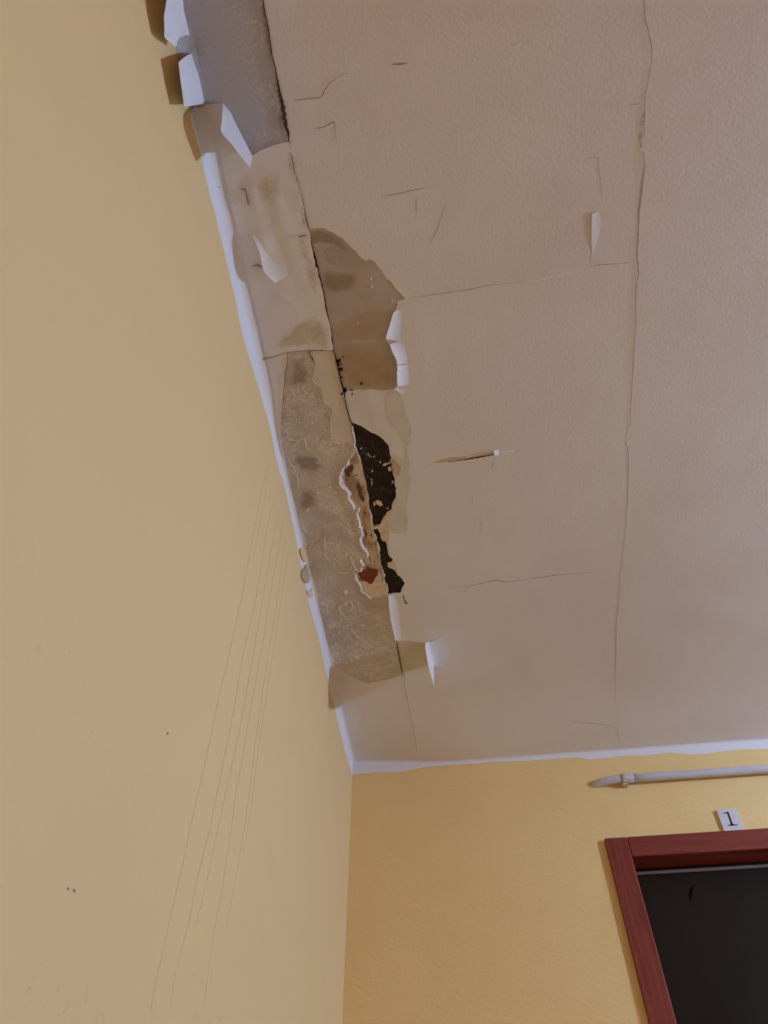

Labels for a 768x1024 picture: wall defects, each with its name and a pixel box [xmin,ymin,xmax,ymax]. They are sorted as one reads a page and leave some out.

peeling [164,0,289,167]
crack [263,0,353,426]
peeling [591,211,602,257]
crack [620,0,651,438]
leakage [344,464,366,514]
flaking render [263,228,449,685]
crack [434,450,512,463]